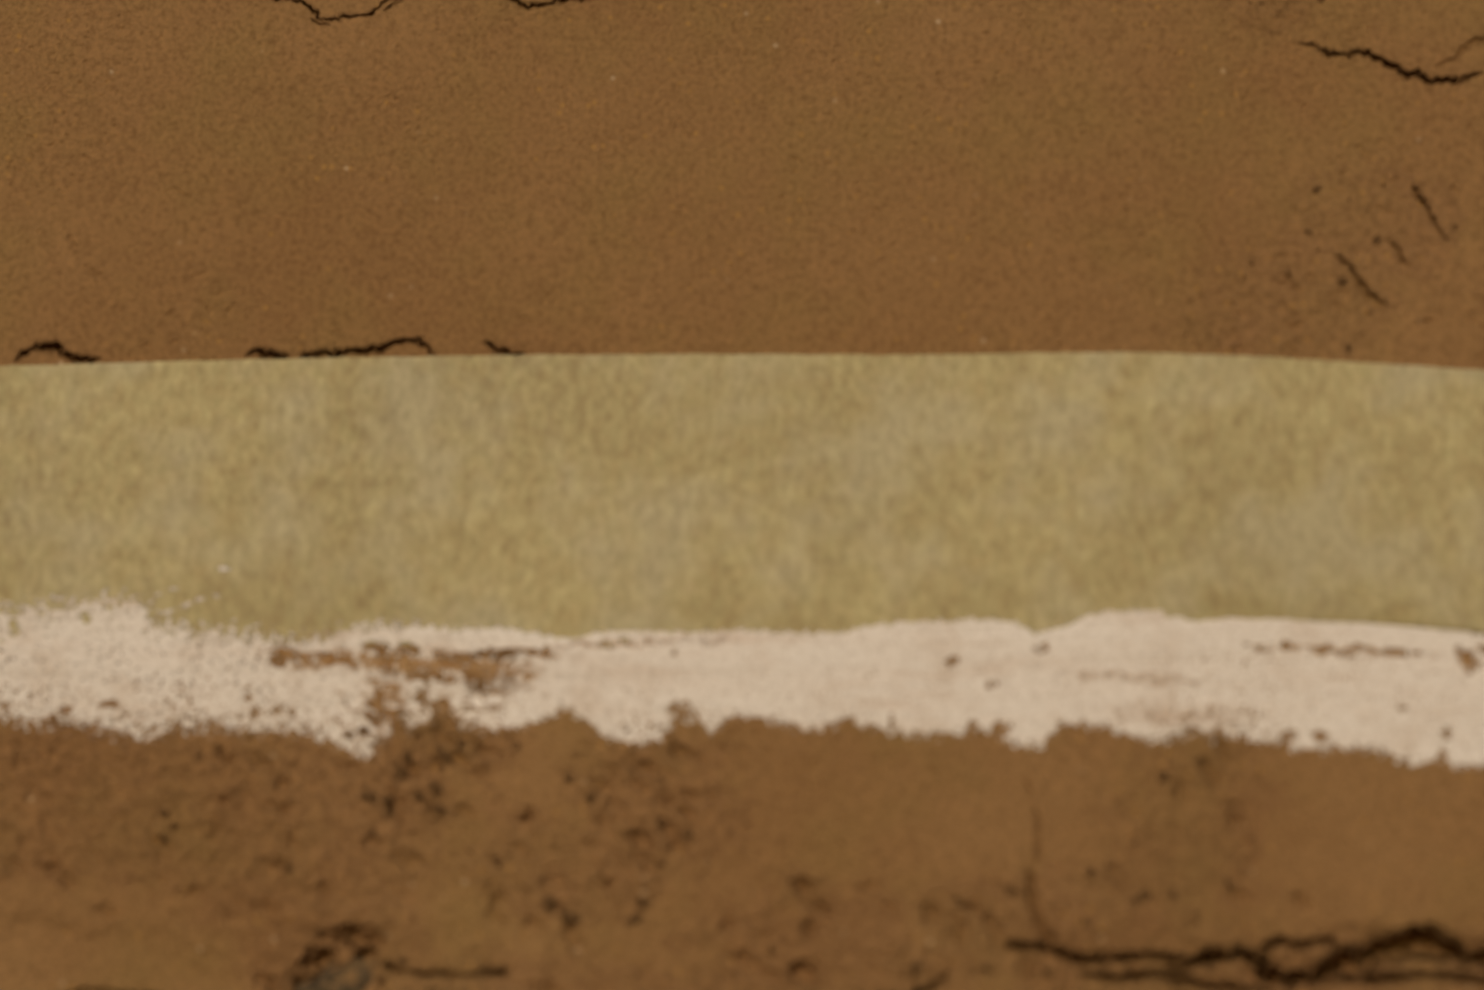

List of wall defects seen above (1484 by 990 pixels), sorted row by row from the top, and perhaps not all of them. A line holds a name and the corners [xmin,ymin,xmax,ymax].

crack [273,0,403,26]
crack [506,0,591,11]
crack [1297,36,1484,86]
crack [14,339,101,364]
crack [246,335,435,359]
crack [483,339,525,355]
spalling [0,676,1484,990]
crack [1005,776,1484,990]